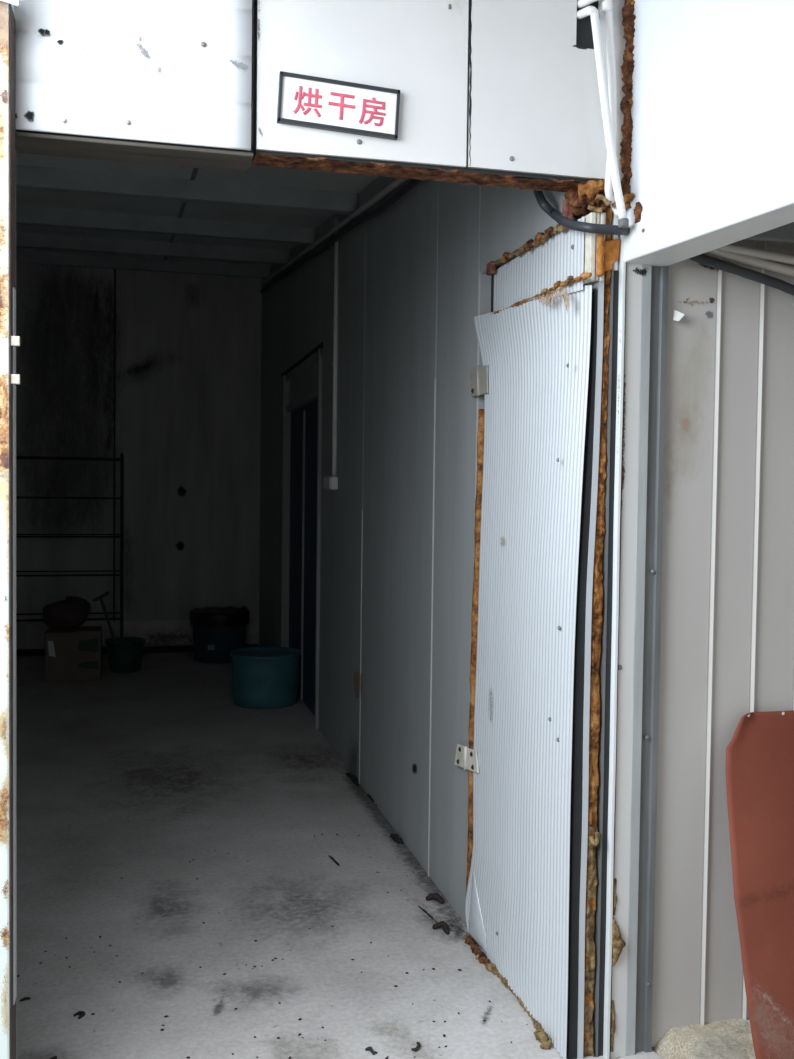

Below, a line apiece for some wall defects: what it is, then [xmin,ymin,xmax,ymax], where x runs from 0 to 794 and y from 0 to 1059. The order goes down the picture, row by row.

rust [0,67,8,173]
rust [252,153,585,192]
rust [0,206,9,338]
rust [0,773,9,843]
rust [0,924,9,950]